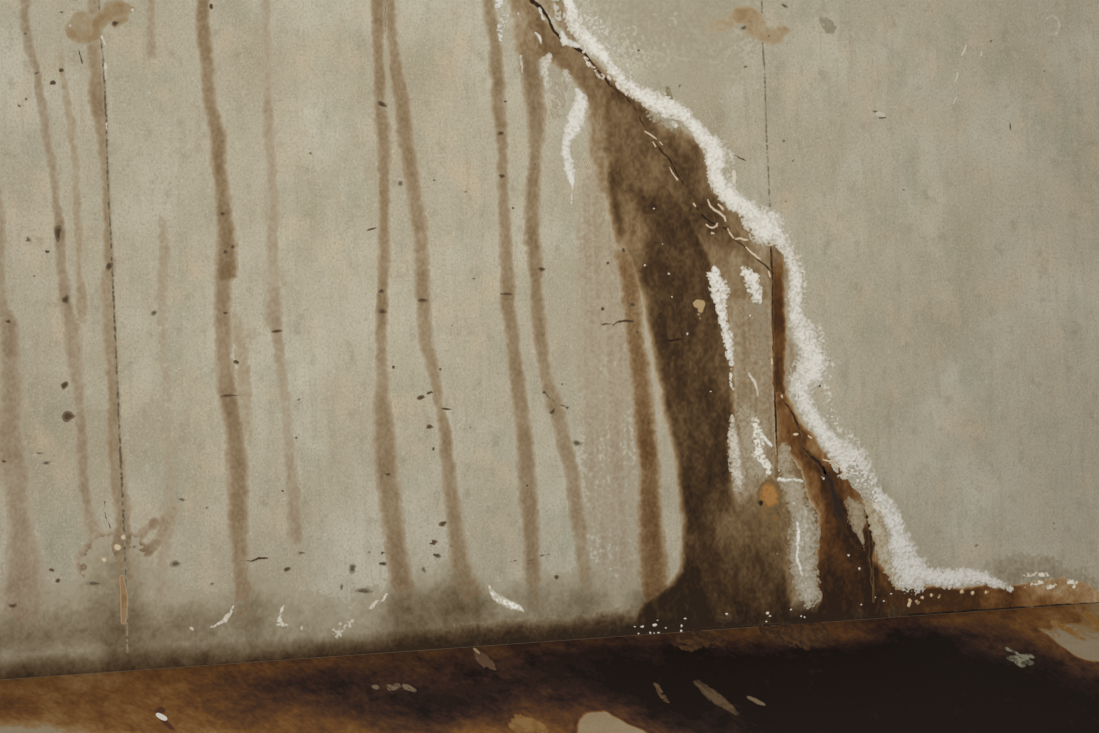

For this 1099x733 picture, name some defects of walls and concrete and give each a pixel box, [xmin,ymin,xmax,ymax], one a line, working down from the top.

corrosion [65,0,135,45]
corrosion [706,5,791,46]
damp [18,0,100,538]
damp [86,40,132,534]
damp [260,0,305,551]
crack [529,0,1099,622]
damp [848,474,877,503]
damp [785,500,822,609]
damp [844,496,897,587]
damp [448,606,648,647]
damp [682,613,744,632]
damp [781,598,843,625]